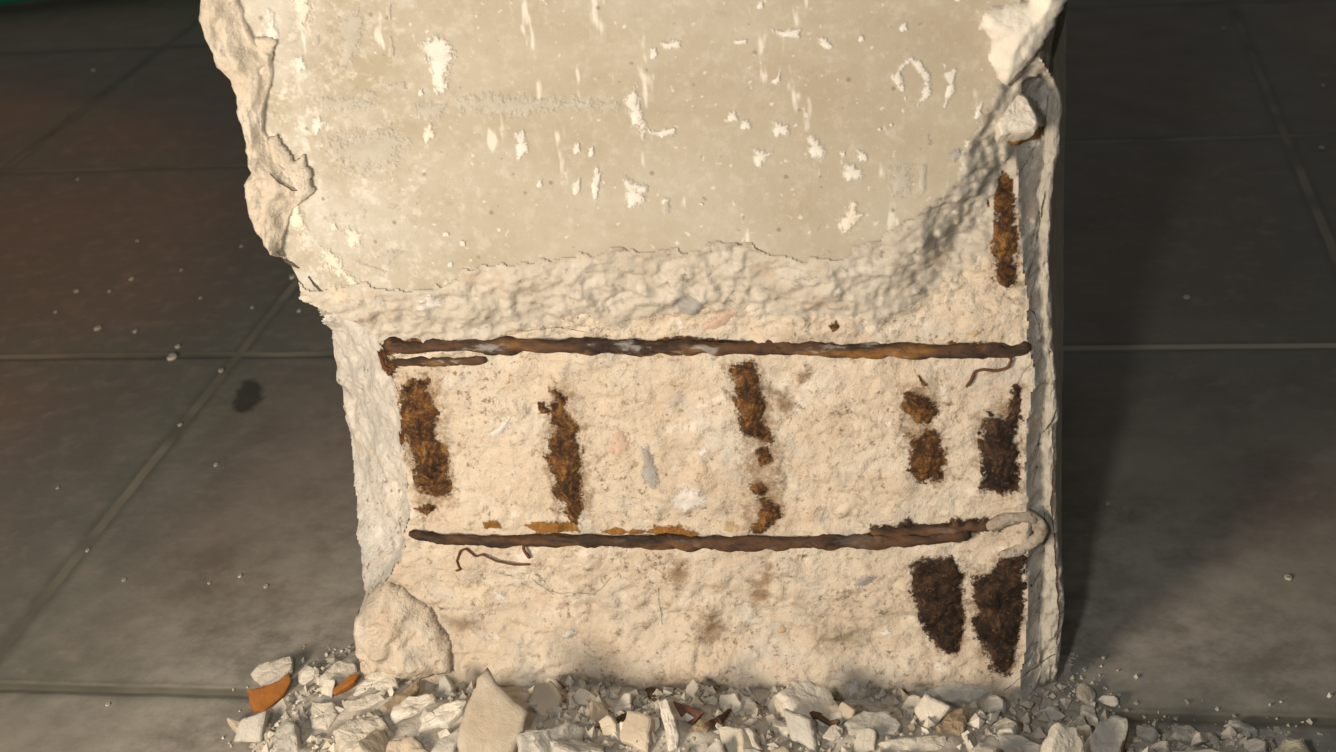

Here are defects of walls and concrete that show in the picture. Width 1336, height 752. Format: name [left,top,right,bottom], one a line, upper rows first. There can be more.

corrosion [986,170,1020,290]
corrosion [377,338,453,516]
corrosion [525,389,591,534]
spalling [298,0,1067,752]
corrosion [728,359,791,536]
corrosion [899,376,948,485]
corrosion [977,384,1025,497]
corrosion [482,520,501,529]
corrosion [602,524,700,537]
corrosion [870,517,918,530]
corrosion [945,516,1003,534]
corrosion [908,554,1028,678]